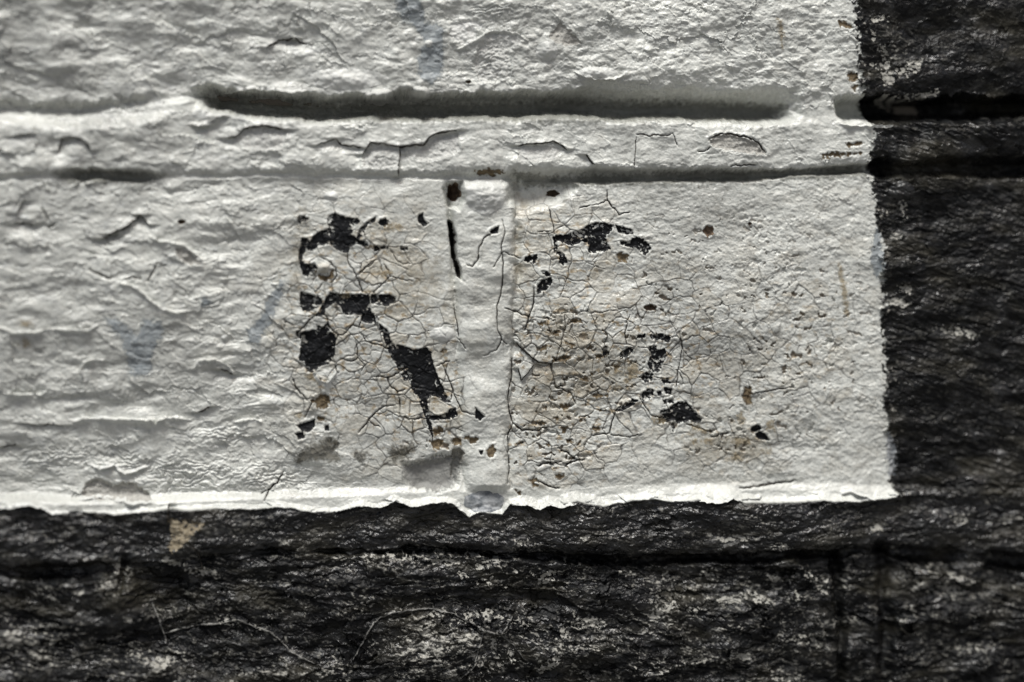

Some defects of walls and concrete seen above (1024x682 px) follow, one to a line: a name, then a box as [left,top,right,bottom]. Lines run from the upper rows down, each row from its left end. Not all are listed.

crack [317,130,457,176]
crack [634,133,766,168]
crack [580,192,630,214]
crack [292,253,433,446]
crack [438,309,475,415]
crack [447,221,658,489]
crack [656,333,683,387]